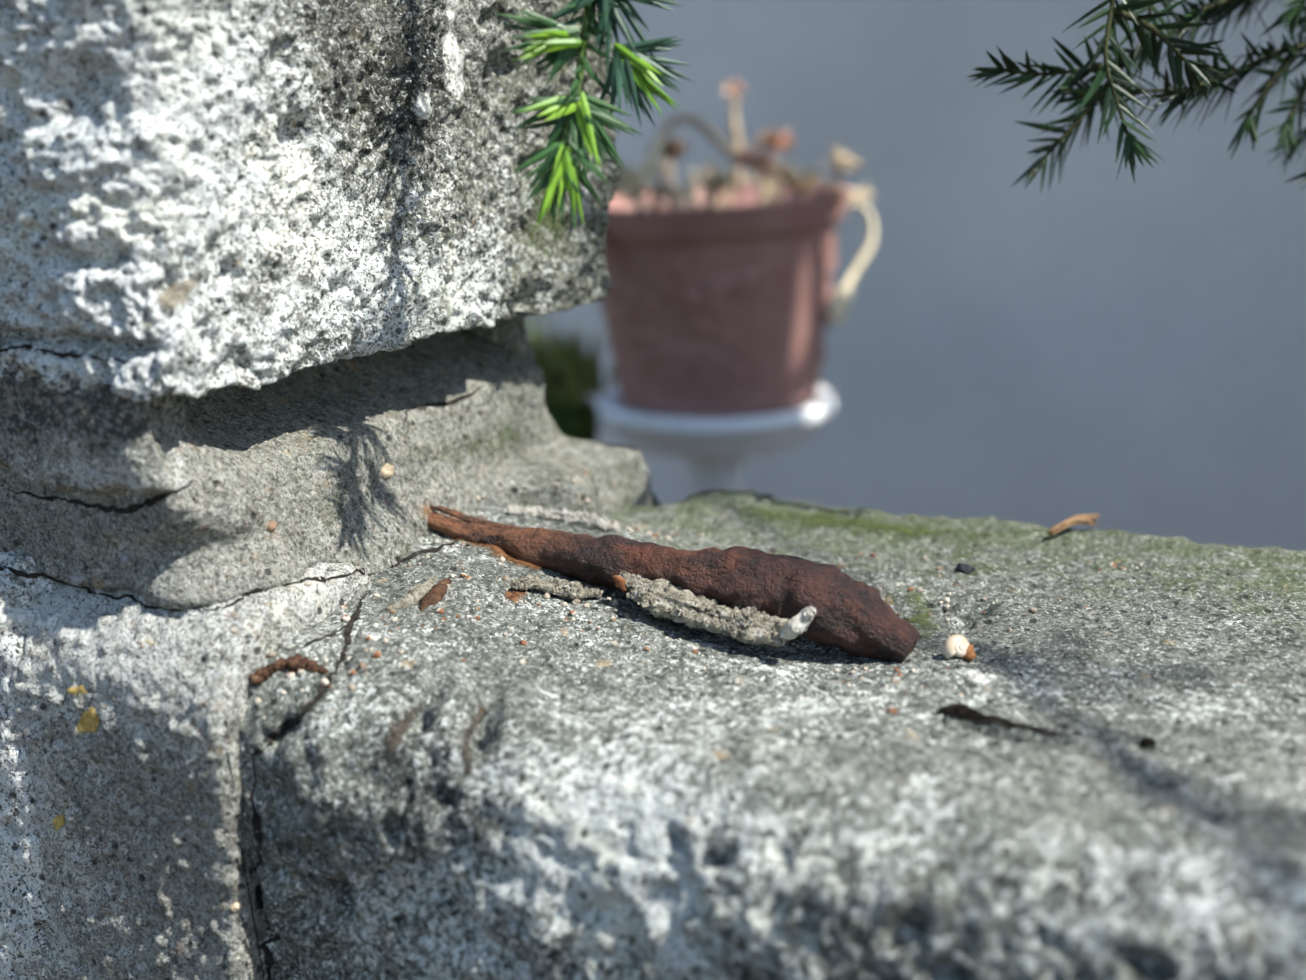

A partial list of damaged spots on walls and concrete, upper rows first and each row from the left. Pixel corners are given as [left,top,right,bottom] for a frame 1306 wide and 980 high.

crack [0,344,132,363]
crack [4,480,195,514]
crack [0,539,460,980]